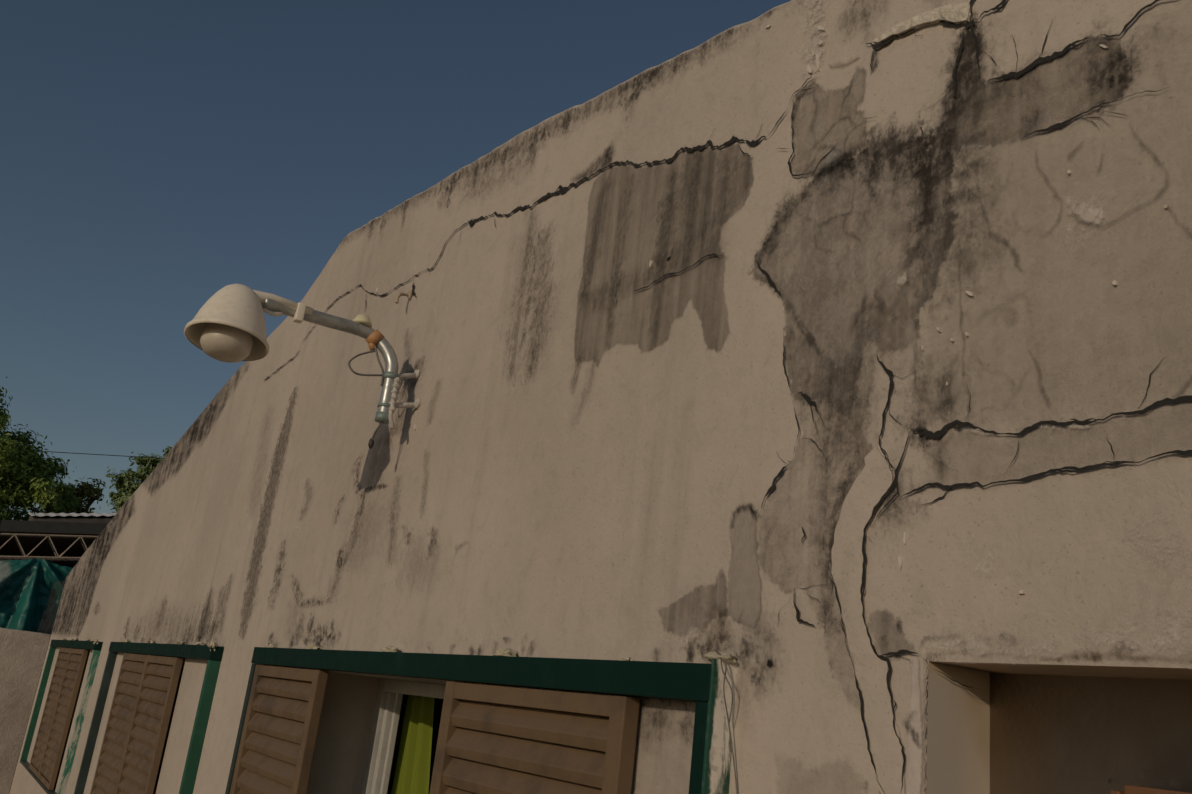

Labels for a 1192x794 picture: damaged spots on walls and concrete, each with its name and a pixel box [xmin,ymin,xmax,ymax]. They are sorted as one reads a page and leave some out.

leakage [933,15,981,168]
crack [866,0,1159,132]
crack [1021,87,1169,138]
crack [265,77,836,380]
leakage [41,500,133,635]
leakage [150,391,227,491]
leakage [241,390,297,635]
crack [750,343,826,542]
crack [777,356,1192,794]
peeling [906,657,923,794]